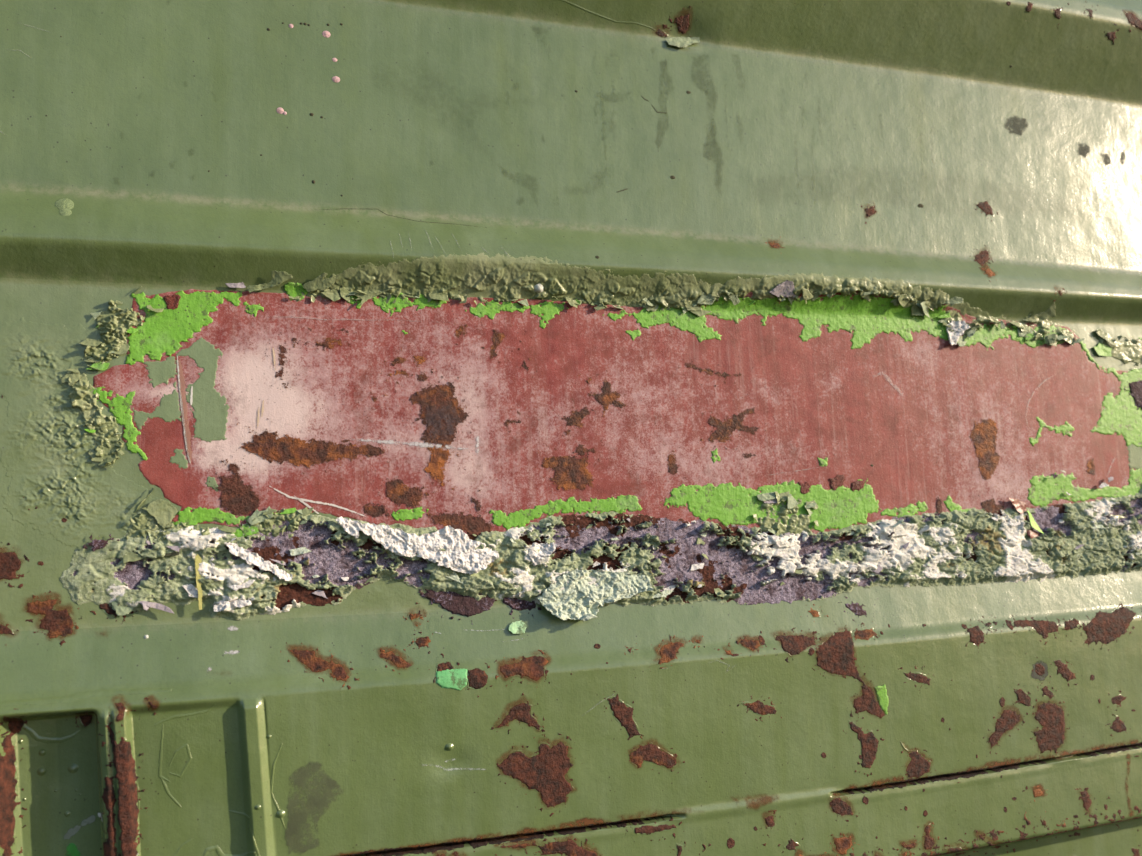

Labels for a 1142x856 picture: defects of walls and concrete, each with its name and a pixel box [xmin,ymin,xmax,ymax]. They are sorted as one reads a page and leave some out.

rust [1104,10,1142,45]
rust [206,418,396,526]
rust [358,347,494,540]
peeling [61,252,1142,581]
rust [969,416,1006,516]
rust [0,709,32,856]
rust [0,542,148,646]
rust [66,697,166,856]
peeling [111,601,134,616]
rust [286,642,360,690]
rust [337,589,686,856]
rust [651,596,1142,856]